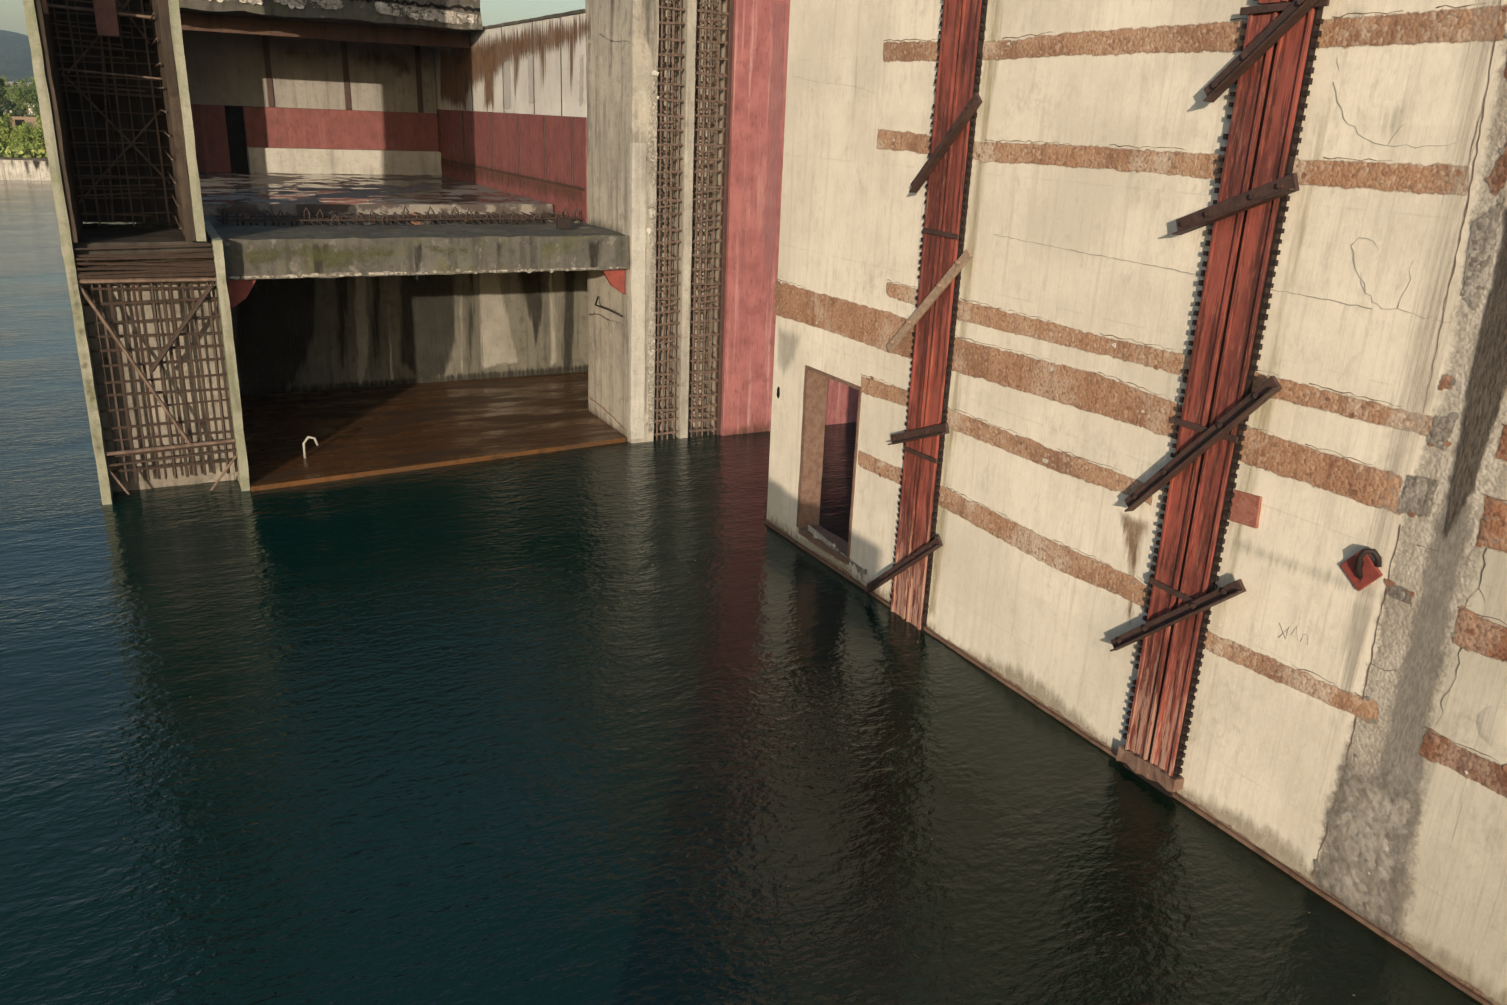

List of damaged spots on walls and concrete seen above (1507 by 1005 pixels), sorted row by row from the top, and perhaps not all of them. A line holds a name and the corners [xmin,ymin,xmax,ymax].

rust [439,14,591,112]
spalling [982,18,1248,60]
spalling [1317,3,1507,48]
crack [994,234,1205,277]
crack [1271,0,1501,412]
spalling [1293,142,1507,310]
damp [237,242,599,396]
spalling [774,279,918,359]
spalling [952,298,1191,437]
spalling [1240,424,1439,517]
rust [1124,517,1143,567]
damp [1367,211,1507,886]